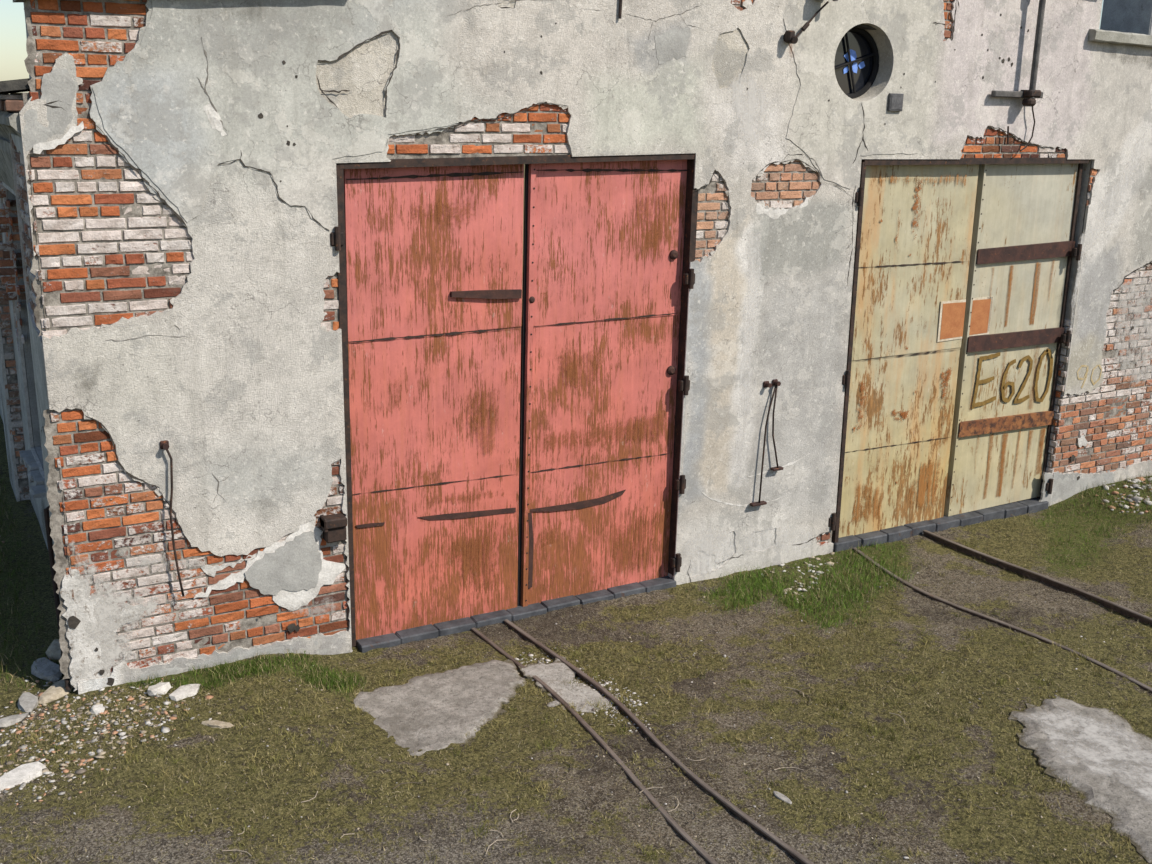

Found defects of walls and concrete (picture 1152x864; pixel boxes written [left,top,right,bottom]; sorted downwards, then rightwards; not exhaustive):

crack [197,37,223,125]
flaking render [316,31,399,118]
flaking render [712,28,749,90]
flaking render [943,0,955,50]
flaking render [0,0,194,501]
crack [218,152,327,229]
flaking render [386,102,570,159]
flaking render [695,171,730,262]
flaking render [751,160,820,209]
flaking render [961,126,1066,158]
flaking render [1052,263,1152,480]
flaking render [43,408,348,686]